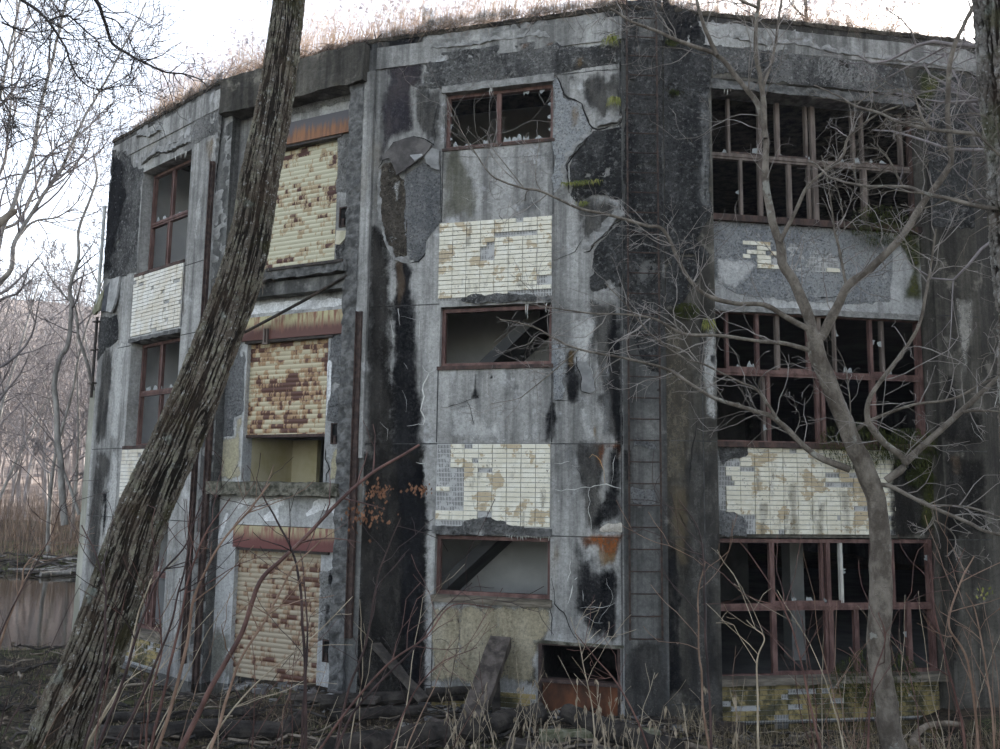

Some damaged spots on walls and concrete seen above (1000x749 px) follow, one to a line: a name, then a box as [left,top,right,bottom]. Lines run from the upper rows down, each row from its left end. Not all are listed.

spalling [377,0,975,372]
spalling [92,150,144,361]
leakage [356,226,550,693]
spalling [720,447,748,464]
rust [583,536,621,560]
spalling [719,509,748,537]
leakage [576,550,618,640]